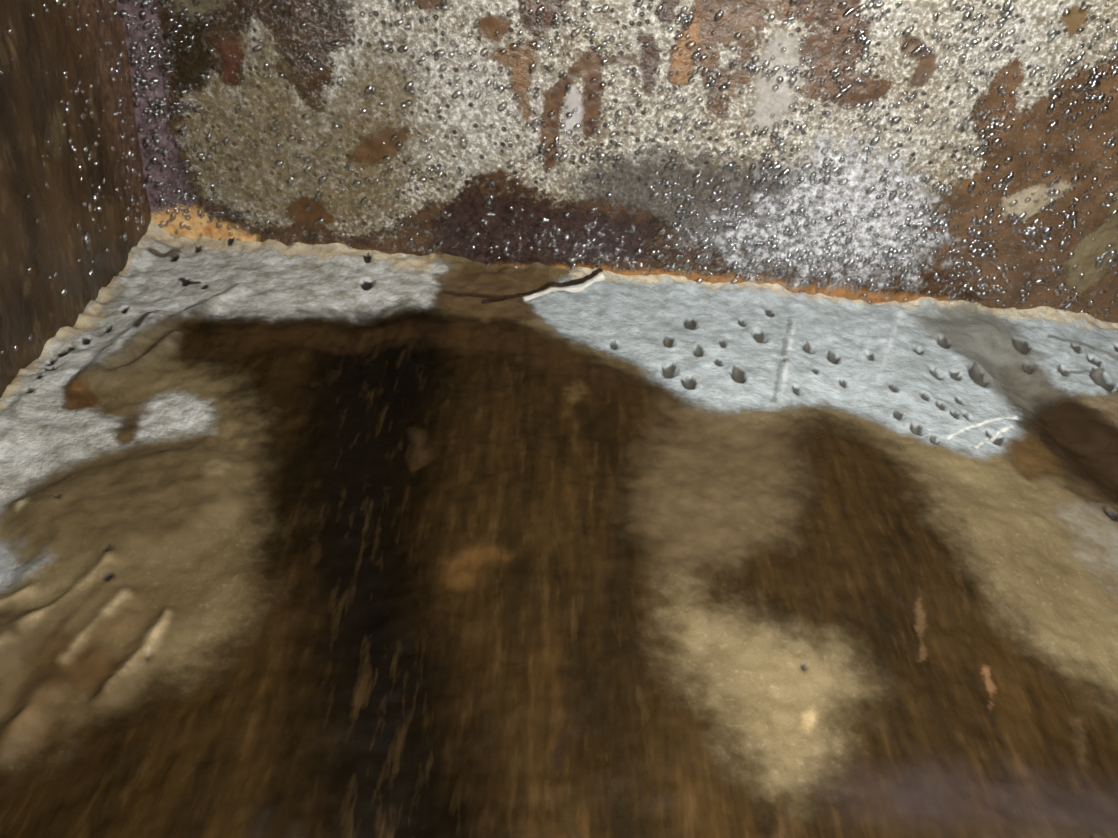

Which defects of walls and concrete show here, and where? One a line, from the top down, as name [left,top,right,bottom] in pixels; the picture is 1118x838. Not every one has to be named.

crack [443,268,605,303]
damp [0,264,1118,838]
rust [73,0,1118,323]
damp [570,133,1118,570]